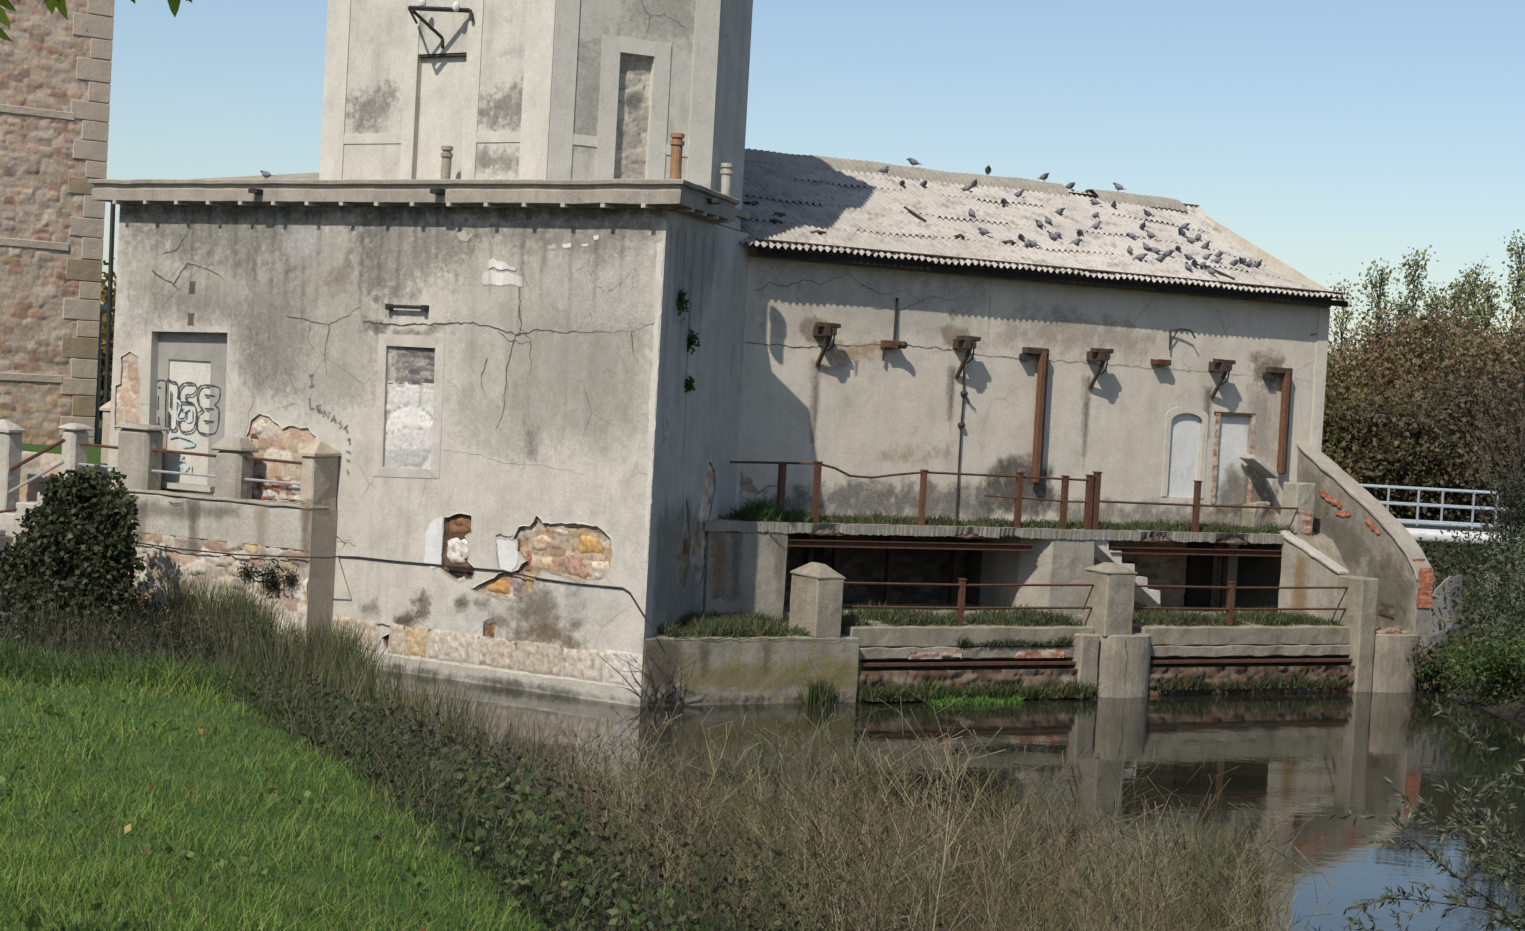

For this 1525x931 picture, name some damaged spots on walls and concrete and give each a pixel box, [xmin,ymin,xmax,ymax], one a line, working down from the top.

crack [152,226,223,290]
crack [287,264,693,474]
spalling [232,386,319,478]
spalling [675,460,716,592]
water stain [748,458,1080,521]
spalling [424,511,614,639]
flaking render [1412,559,1434,608]